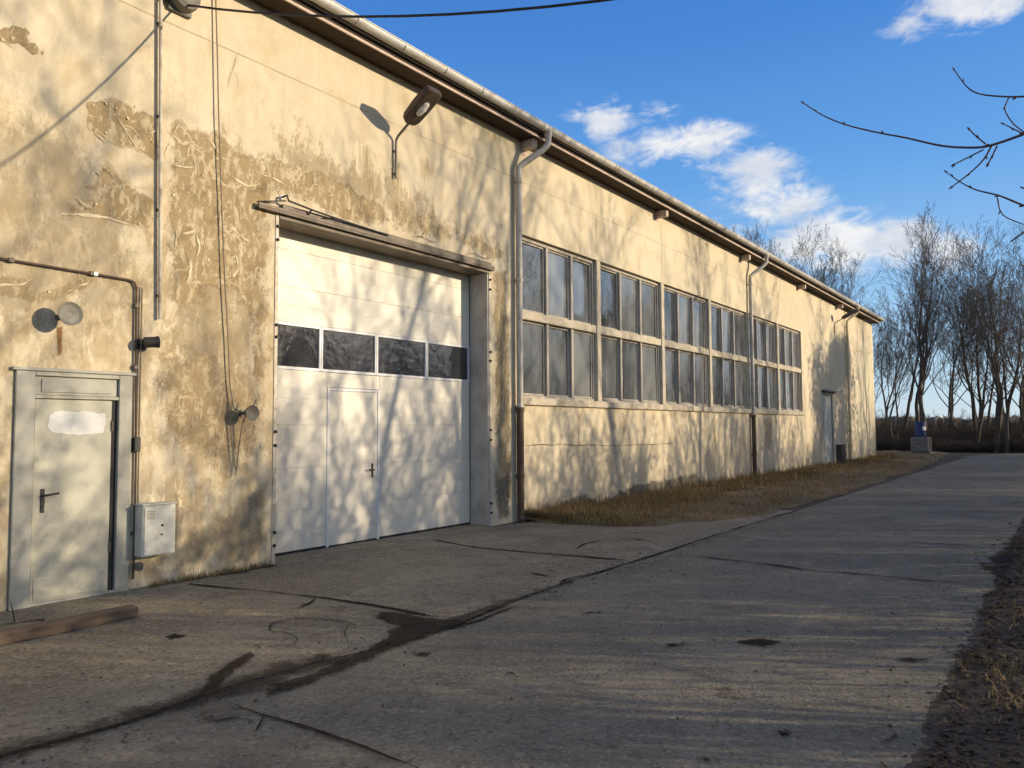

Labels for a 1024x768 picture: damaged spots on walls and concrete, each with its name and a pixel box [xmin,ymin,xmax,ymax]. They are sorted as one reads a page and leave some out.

peeling [0,22,44,55]
peeling [47,98,512,499]
water stain [497,476,509,518]
crack [186,583,441,642]